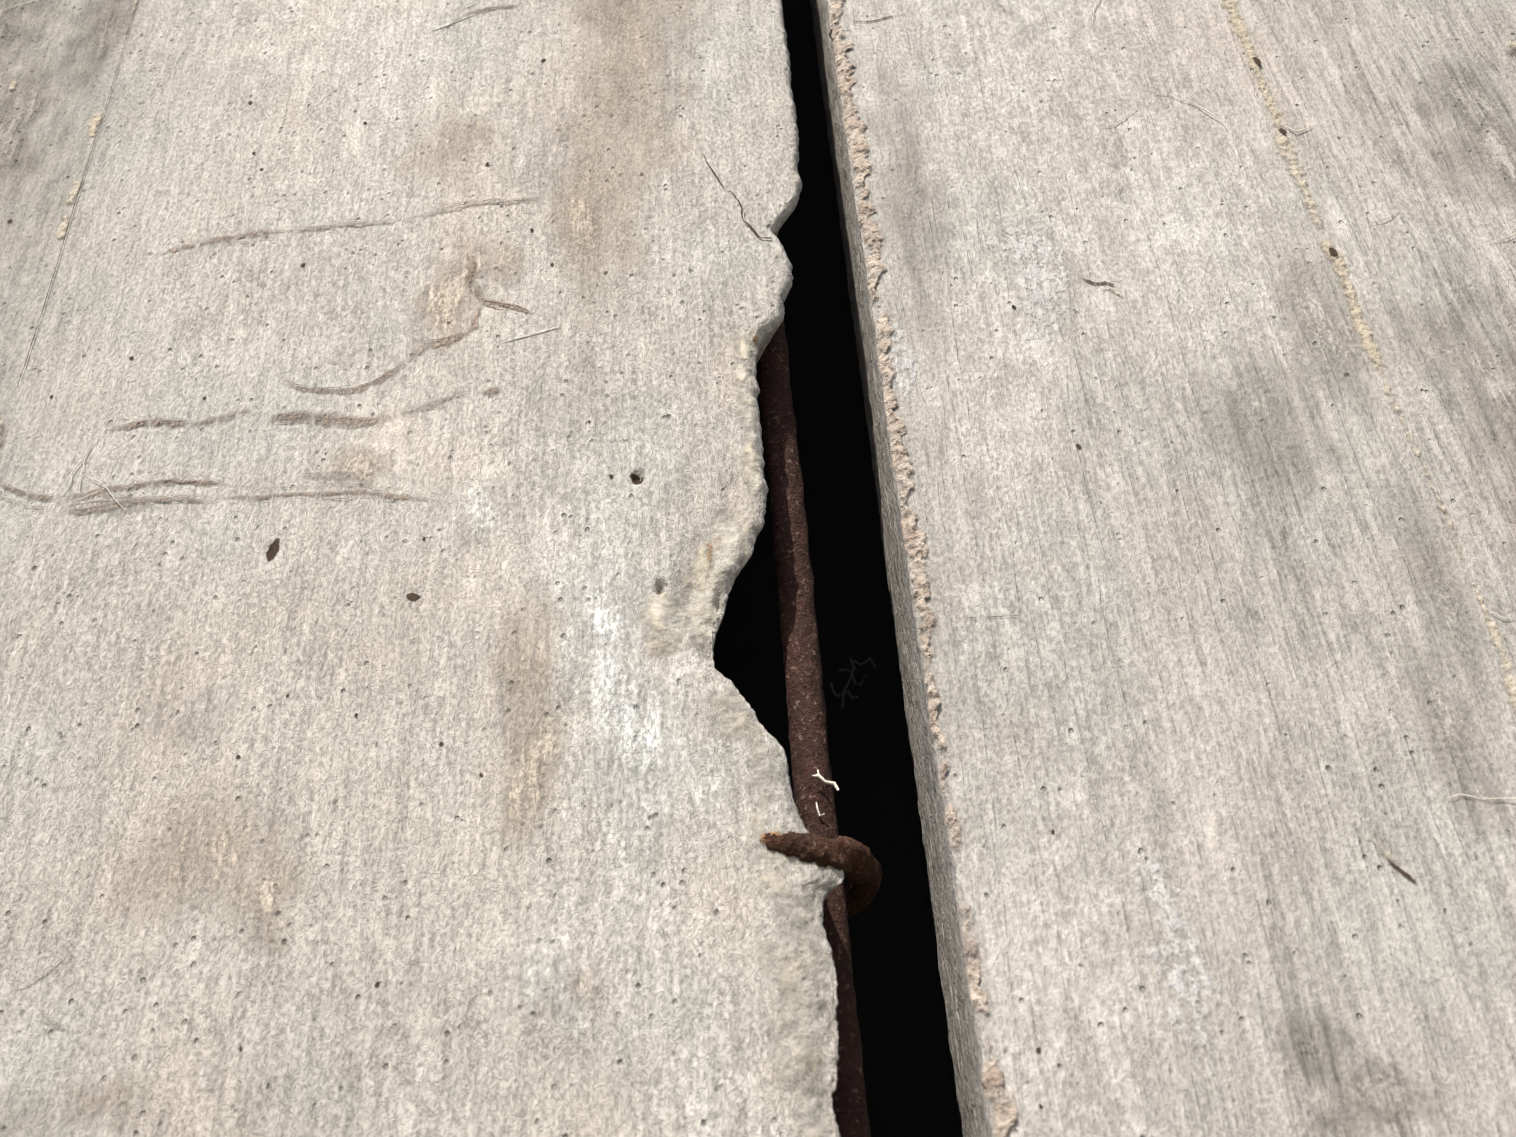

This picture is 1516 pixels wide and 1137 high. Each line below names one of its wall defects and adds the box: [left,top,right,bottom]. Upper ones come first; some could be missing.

crack [703,153,771,239]
spalling [828,0,961,866]
spalling [707,690,779,795]
spalling [958,903,989,1013]
spalling [982,1041,1018,1137]